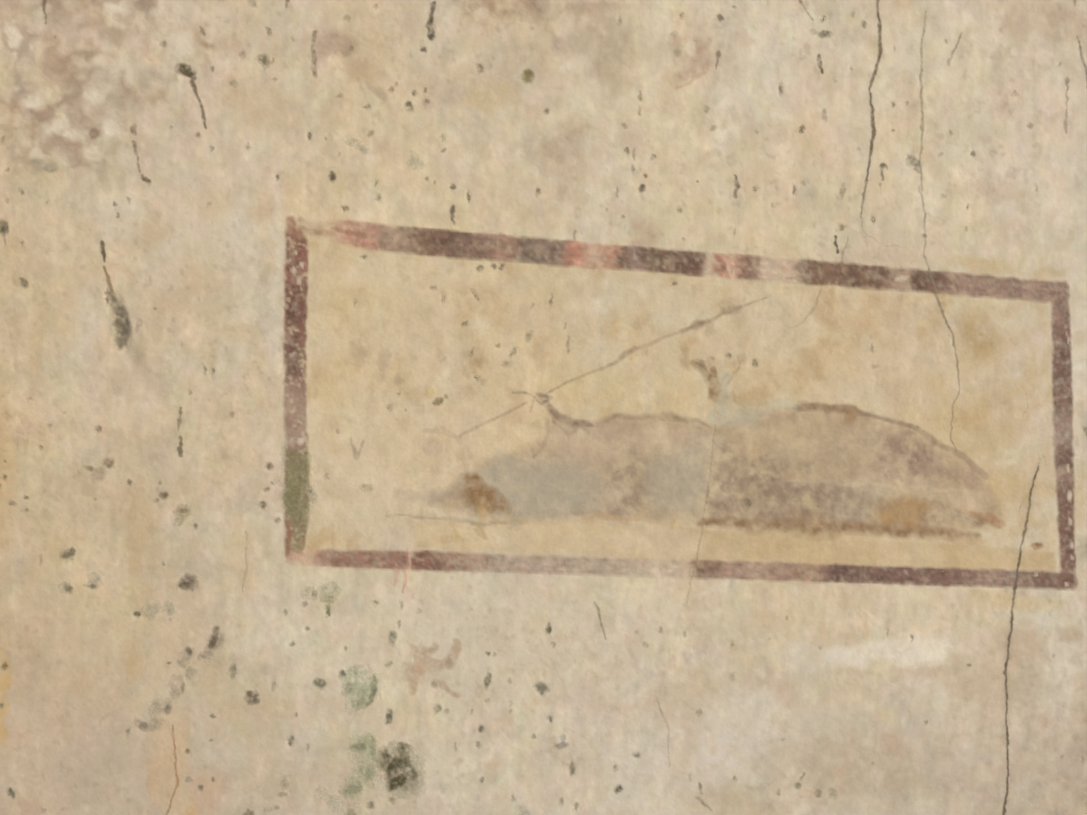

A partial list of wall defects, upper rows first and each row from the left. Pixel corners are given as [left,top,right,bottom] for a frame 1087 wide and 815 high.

crack [839,0,963,451]
crack [1002,454,1048,815]